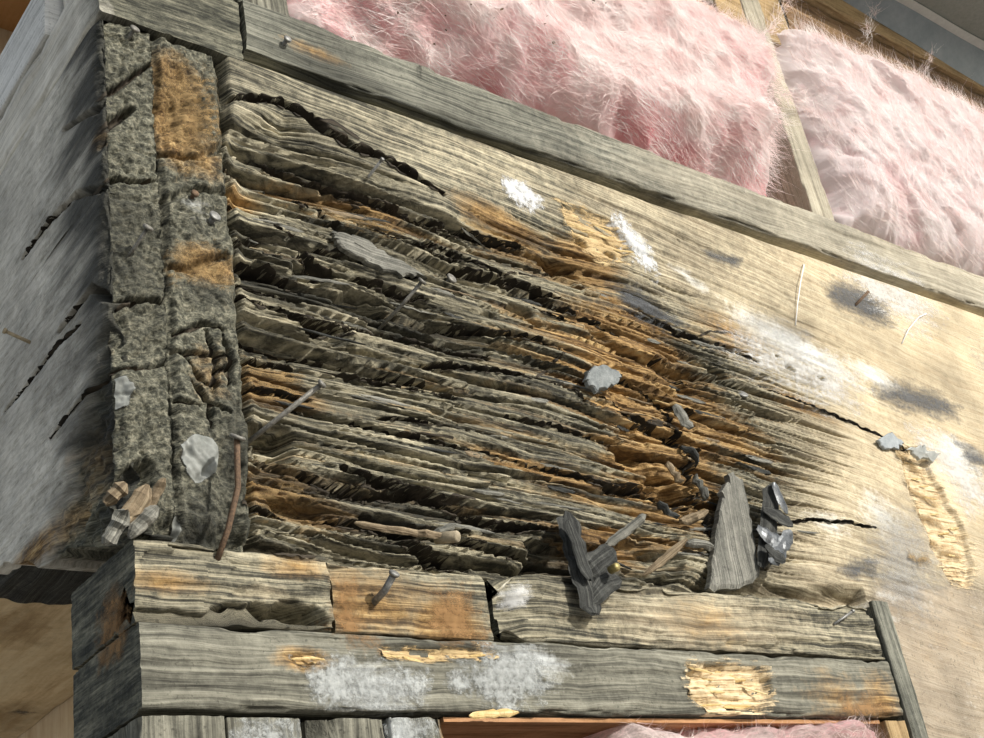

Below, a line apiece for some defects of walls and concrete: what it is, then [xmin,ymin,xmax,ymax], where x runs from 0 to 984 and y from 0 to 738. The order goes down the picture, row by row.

crack [83,68,144,152]
crack [228,92,445,196]
crack [0,178,151,324]
damp [829,282,888,322]
crack [5,303,84,412]
crack [49,163,713,553]
crack [651,318,908,453]
damp [878,387,954,416]
crack [295,464,549,573]
crack [777,517,877,529]
peeling [689,667,768,709]